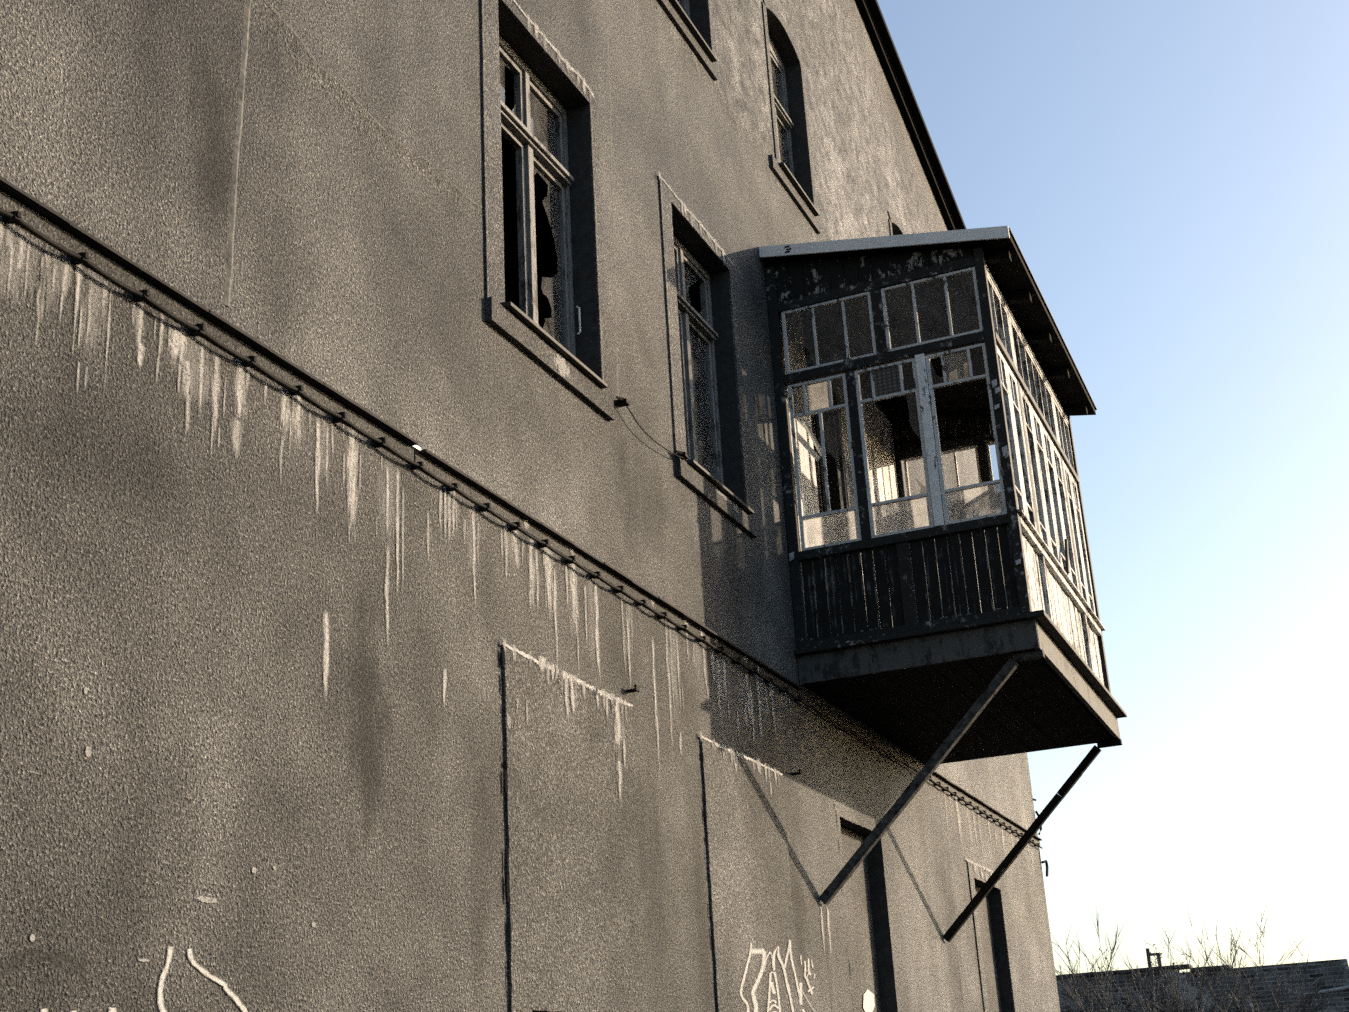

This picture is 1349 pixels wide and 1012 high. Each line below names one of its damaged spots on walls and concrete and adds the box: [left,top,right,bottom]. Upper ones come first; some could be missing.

efflorescence [0,222,111,359]
leakage [659,173,733,264]
efflorescence [133,304,250,453]
efflorescence [264,383,361,538]
efflorescence [381,464,404,629]
efflorescence [427,490,476,599]
efflorescence [501,520,633,797]
efflorescence [652,620,791,774]
efflorescence [701,735,783,796]